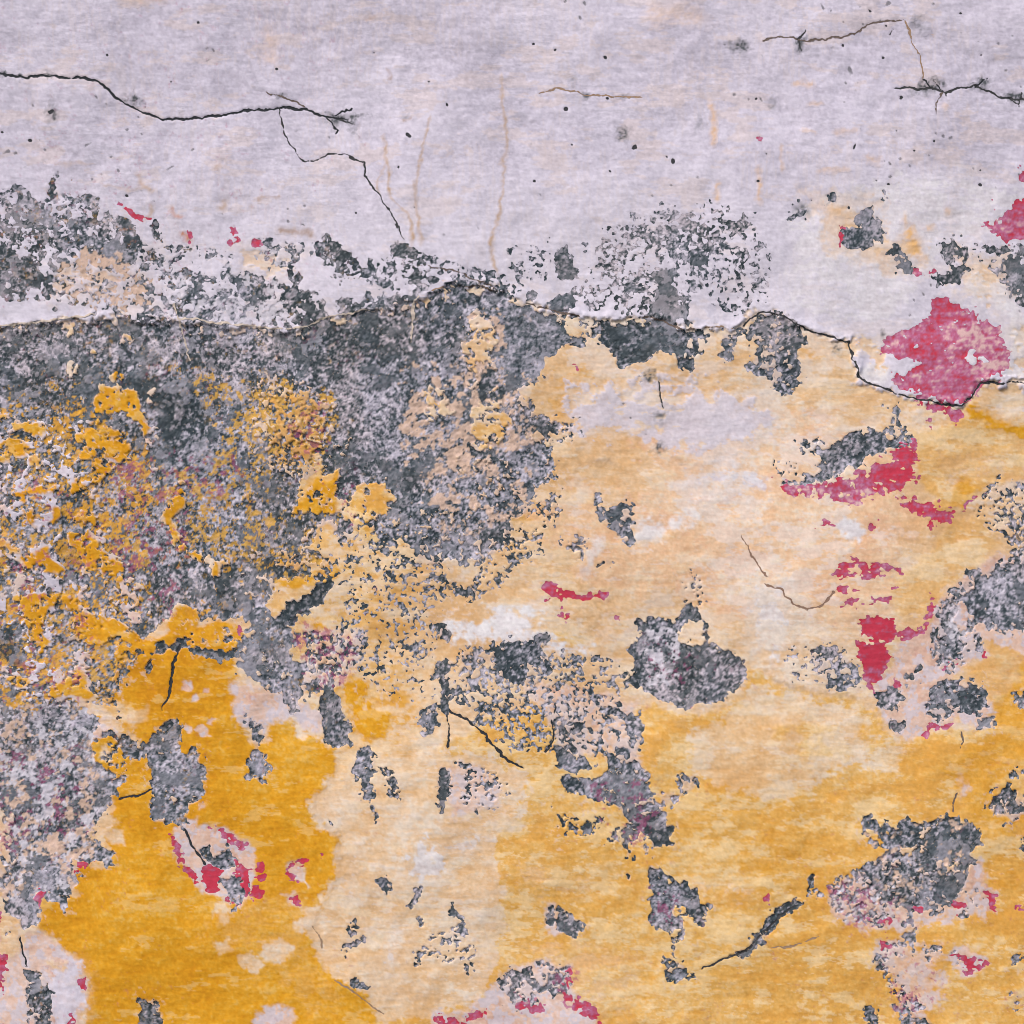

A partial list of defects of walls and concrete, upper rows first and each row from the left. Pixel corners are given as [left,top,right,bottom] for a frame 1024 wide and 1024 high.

crack [762,19,1024,111]
crack [0,72,404,239]
peeling [981,198,1024,246]
crack [410,265,498,339]
crack [643,311,1023,407]
spalling [771,296,1024,739]
spalling [0,171,808,984]
crack [446,709,523,768]
crack [701,874,819,969]
spalling [728,812,998,1024]
spalling [23,966,56,1024]
spalling [496,960,602,1024]